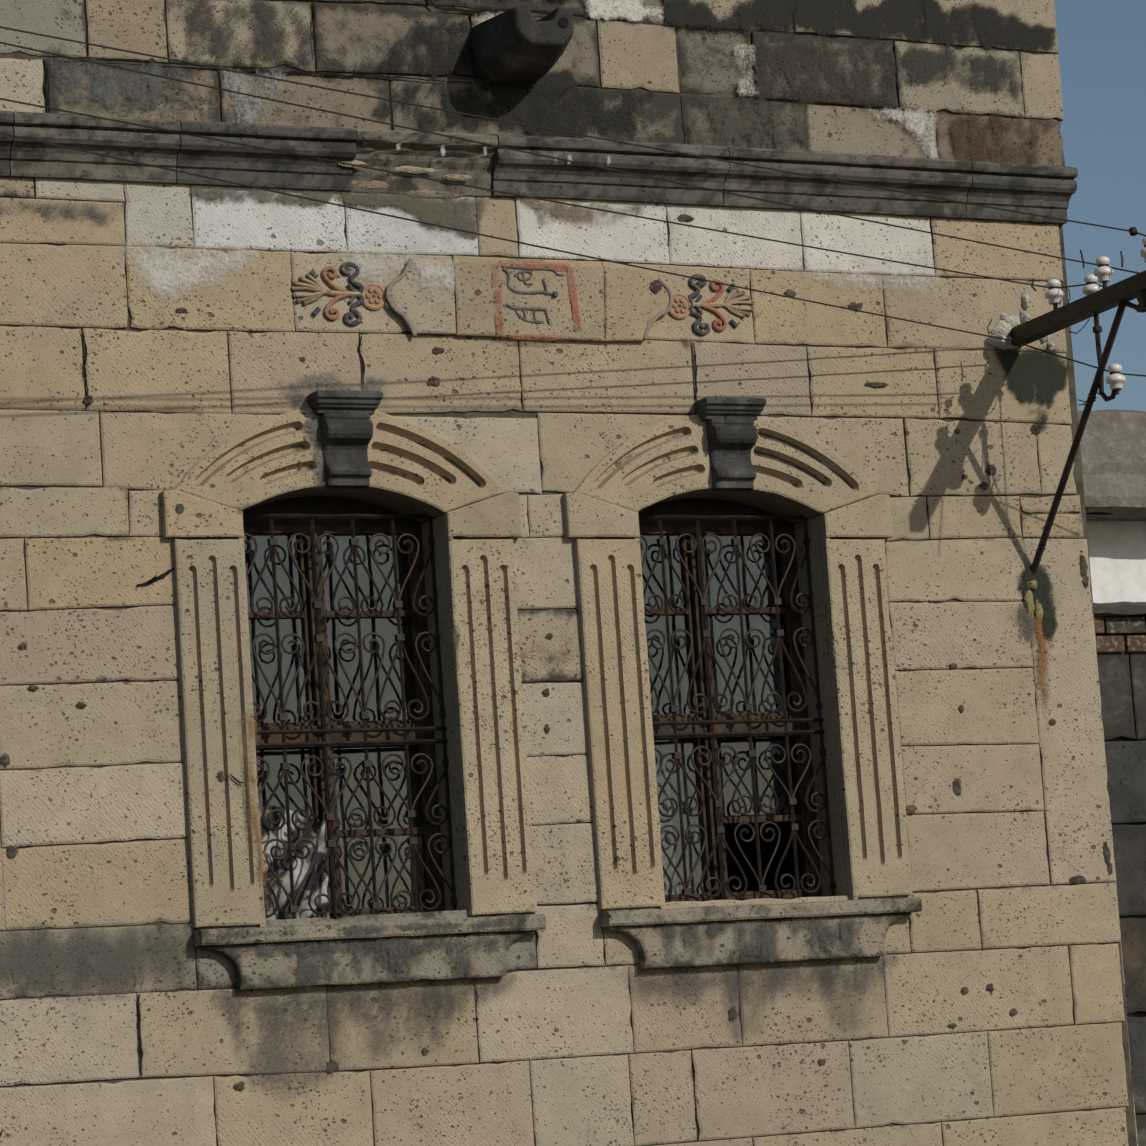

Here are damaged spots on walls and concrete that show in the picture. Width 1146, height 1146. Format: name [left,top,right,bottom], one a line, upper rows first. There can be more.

leakage [191,185,484,238]
leakage [523,198,642,223]
crack [80,329,90,406]
leakage [996,348,1069,430]
rust [1035,617,1050,708]